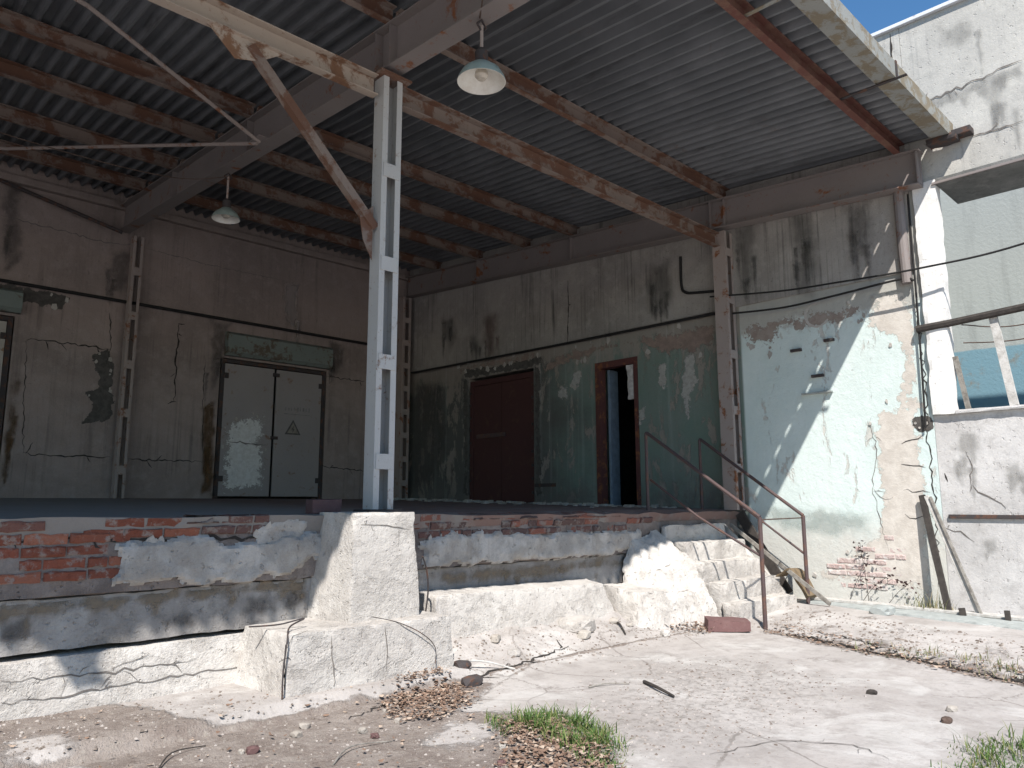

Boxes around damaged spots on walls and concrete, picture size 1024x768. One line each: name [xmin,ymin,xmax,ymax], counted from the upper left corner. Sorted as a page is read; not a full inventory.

crack [926,60,1021,100]
crack [22,313,112,462]
flaking render [82,349,115,424]
crack [168,324,184,404]
peeling [220,412,267,494]
peeling [680,353,699,420]
peeling [744,283,934,599]
crack [870,295,1006,552]
peeling [0,514,321,587]
crack [1,654,237,705]